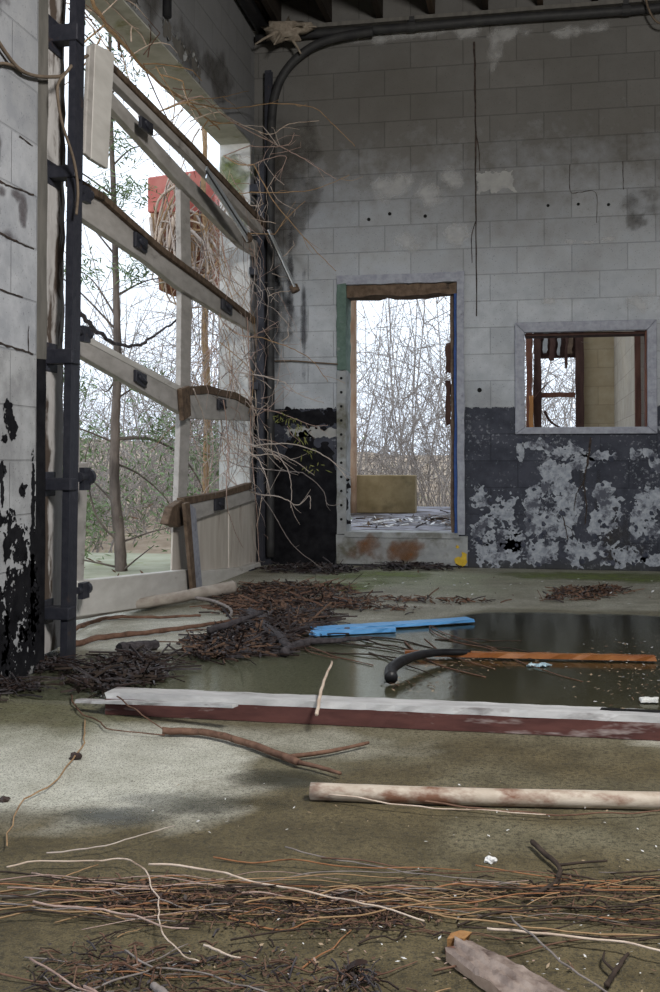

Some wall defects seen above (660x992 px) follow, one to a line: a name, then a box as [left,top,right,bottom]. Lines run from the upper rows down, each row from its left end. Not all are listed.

peeling [1,398,18,443]
peeling [0,449,42,679]
peeling [453,437,660,595]